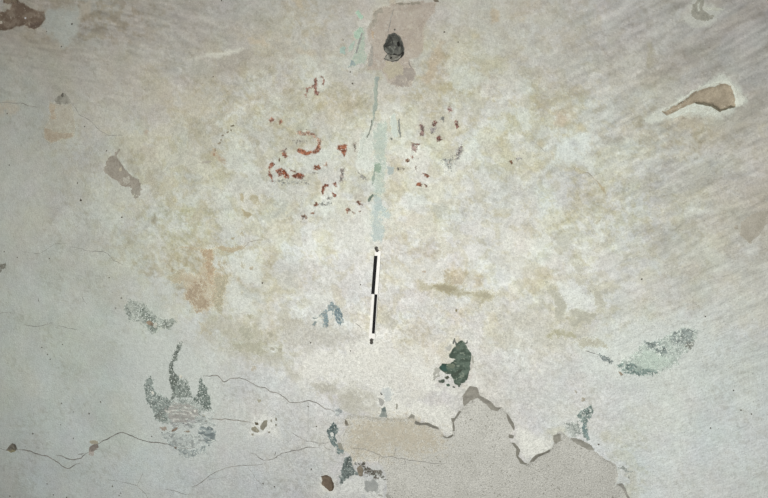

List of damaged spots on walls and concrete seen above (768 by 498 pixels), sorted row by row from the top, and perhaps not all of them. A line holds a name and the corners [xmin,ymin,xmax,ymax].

flaking render [0,0,47,32]
flaking render [662,81,745,118]
flaking render [104,149,142,199]
peeling [643,328,694,356]
peeling [599,353,657,376]
crack [211,375,334,412]
crack [0,432,189,469]
crack [165,433,331,495]
flaking render [338,376,631,498]